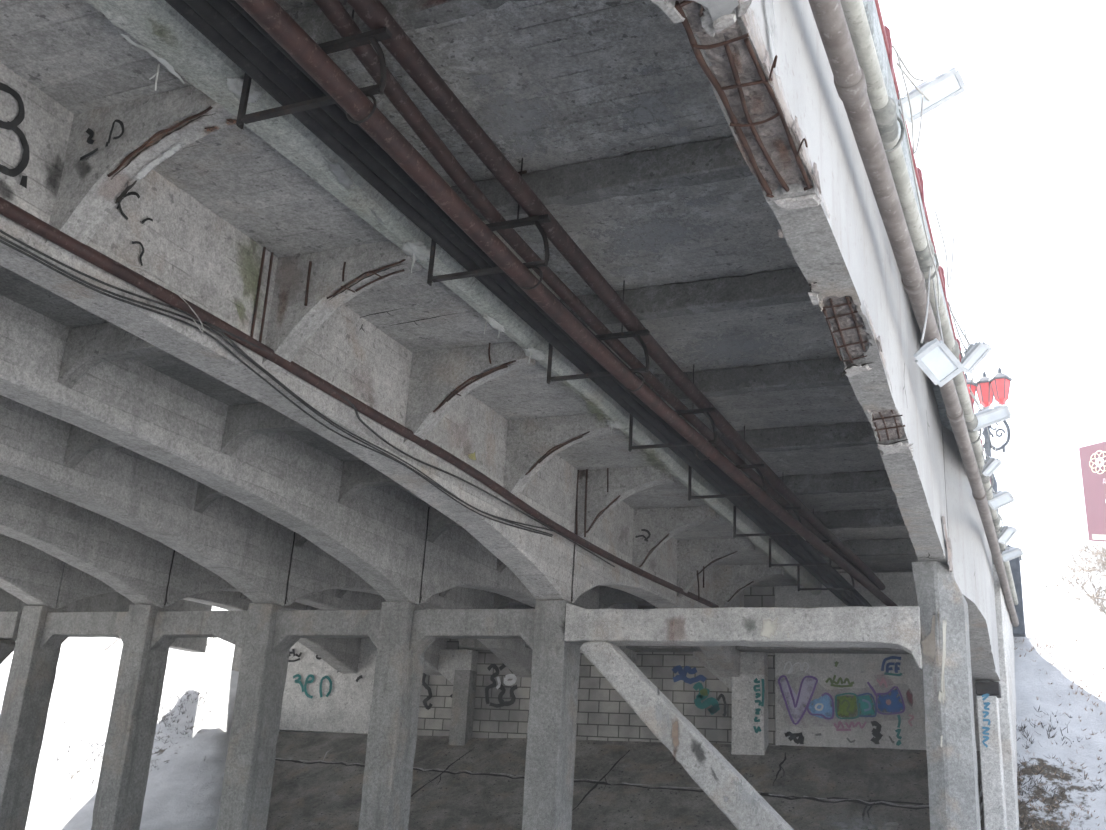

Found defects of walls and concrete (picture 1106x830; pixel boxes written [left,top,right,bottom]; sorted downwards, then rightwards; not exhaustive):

spalling [674,0,830,218]
spalling [808,282,889,378]
spalling [869,409,914,457]